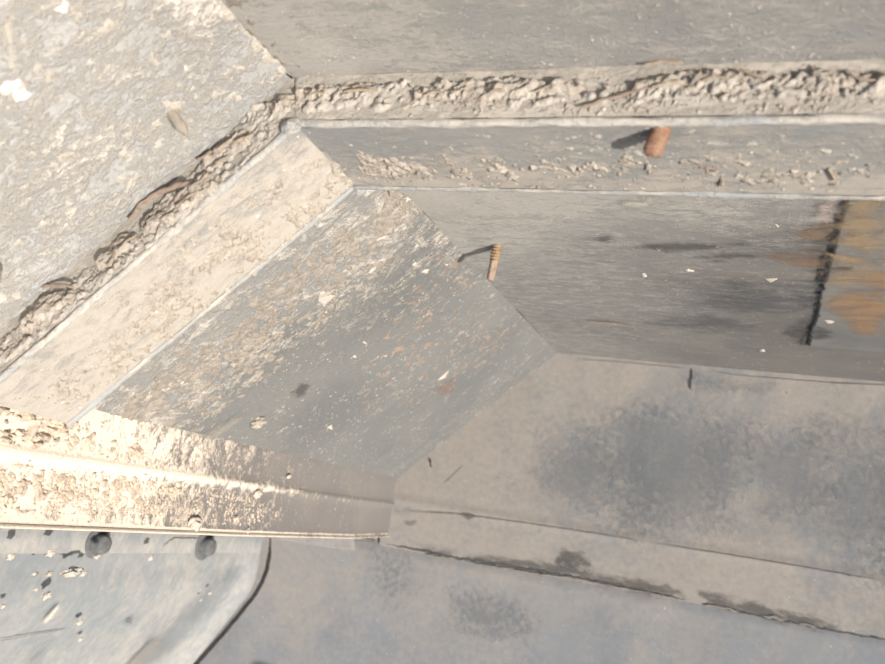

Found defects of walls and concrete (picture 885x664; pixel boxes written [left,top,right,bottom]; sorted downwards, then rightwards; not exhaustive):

crack [801,200,845,345]